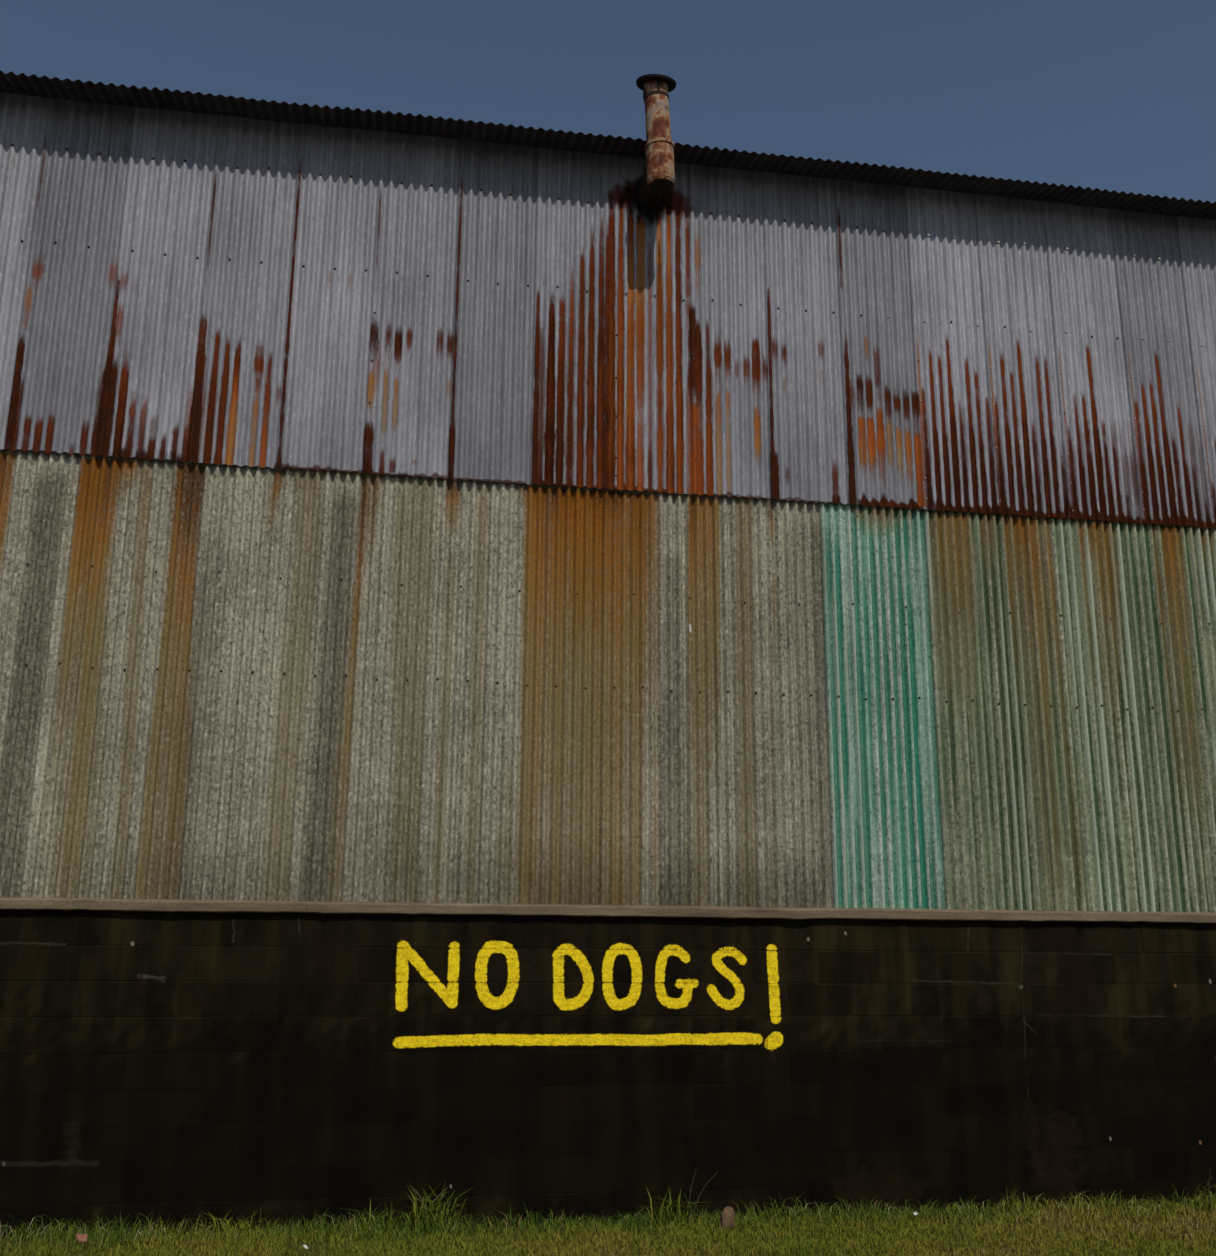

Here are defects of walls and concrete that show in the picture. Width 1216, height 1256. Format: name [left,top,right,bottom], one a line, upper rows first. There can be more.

rust [0,337,55,559]
rust [58,164,789,905]